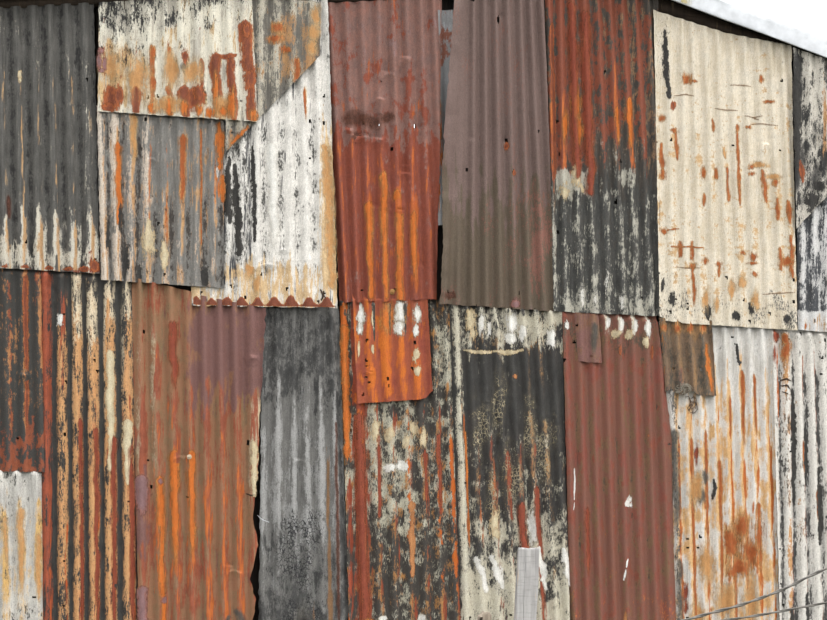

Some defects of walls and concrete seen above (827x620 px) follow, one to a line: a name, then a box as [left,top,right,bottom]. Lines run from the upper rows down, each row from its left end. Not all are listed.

rust [102,19,259,204]
peeling [792,70,802,169]
peeling [224,142,282,257]
rust [701,124,792,224]
rust [364,171,417,335]
peeling [464,308,527,356]
peeling [606,295,651,349]
rust [729,370,757,444]
rust [128,445,197,620]
peeling [472,553,504,593]
peeling [527,510,548,591]
rust [684,430,765,620]